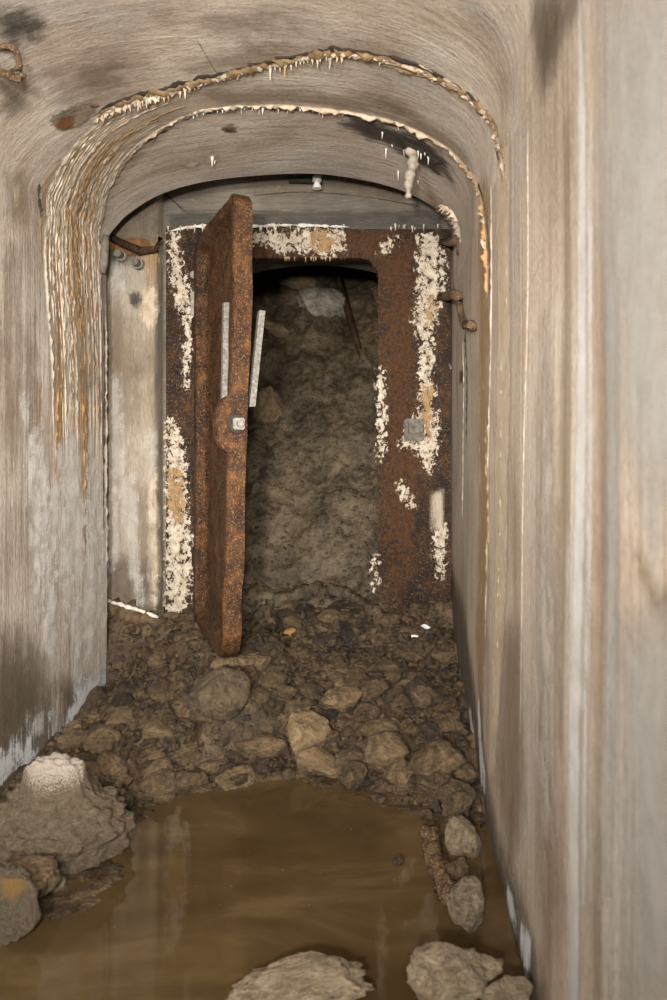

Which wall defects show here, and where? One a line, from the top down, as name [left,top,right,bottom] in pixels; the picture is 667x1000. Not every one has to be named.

water stain [287,93,454,182]
corrosion [108,199,160,285]
water stain [252,211,441,232]
water stain [0,84,272,785]